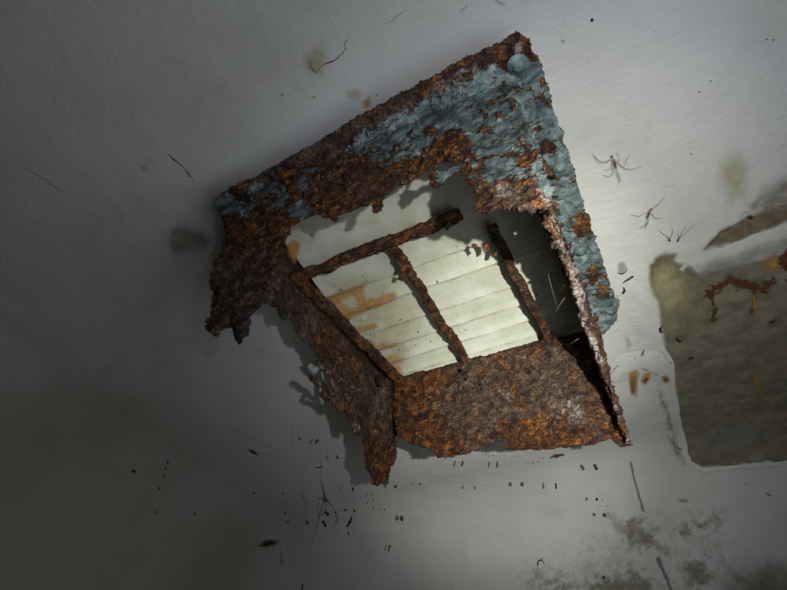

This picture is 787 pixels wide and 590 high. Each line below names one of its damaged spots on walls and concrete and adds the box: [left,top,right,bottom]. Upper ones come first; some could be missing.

rust [296,93,508,198]
rust [471,243,498,258]
rust [327,286,396,319]
rust [395,256,419,286]
rust [704,249,787,323]
spalling [650,257,787,475]
damp [623,519,653,544]